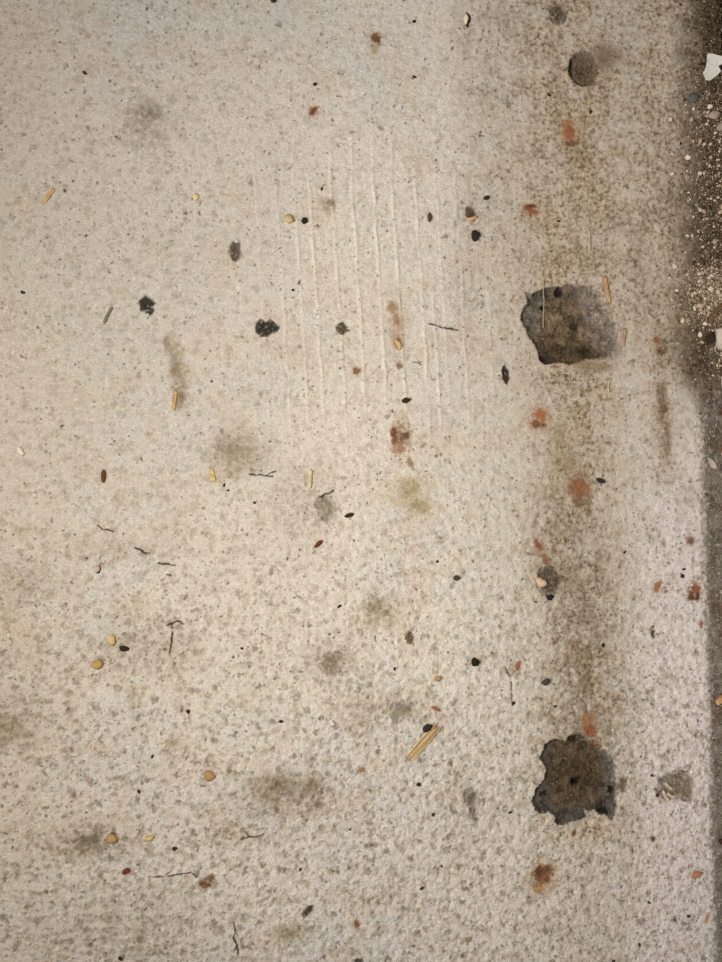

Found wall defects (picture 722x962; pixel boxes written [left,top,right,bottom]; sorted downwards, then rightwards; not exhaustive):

spalling [521,284,615,367]
spalling [531,726,626,825]